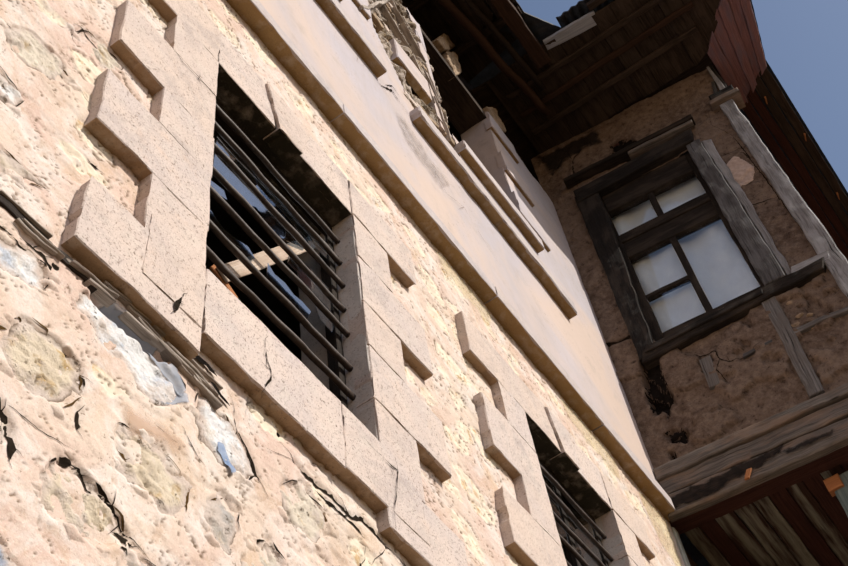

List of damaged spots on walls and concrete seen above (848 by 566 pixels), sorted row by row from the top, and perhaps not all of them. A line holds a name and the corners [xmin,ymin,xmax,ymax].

crack [261,335,272,399]
spalling [643,359,674,418]
crack [678,340,763,380]
crack [0,375,156,566]
crack [230,395,406,566]
spalling [665,428,689,459]